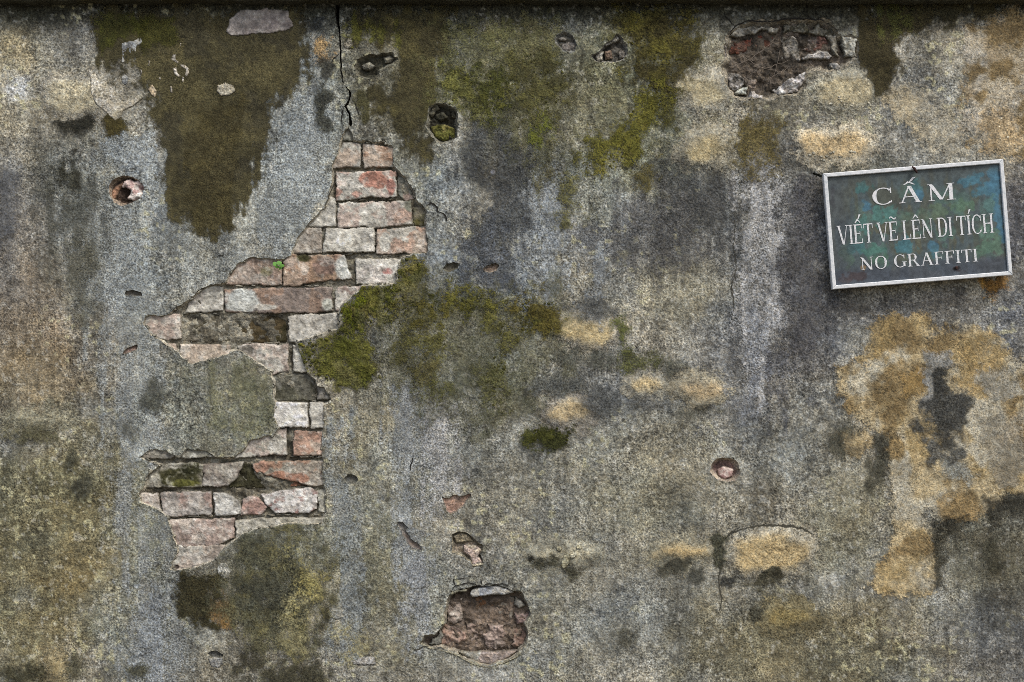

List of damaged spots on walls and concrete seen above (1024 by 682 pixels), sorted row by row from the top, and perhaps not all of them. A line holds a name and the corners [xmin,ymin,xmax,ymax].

crack [332,5,361,126]
spalling [343,39,398,79]
spalling [591,34,628,63]
spalling [721,17,870,109]
water stain [857,3,1024,164]
spalling [109,176,139,206]
water stain [89,4,337,258]
spalling [808,150,856,177]
spalling [139,125,429,579]
spalling [709,457,740,482]
water stain [829,311,1024,598]
spalling [420,585,531,668]